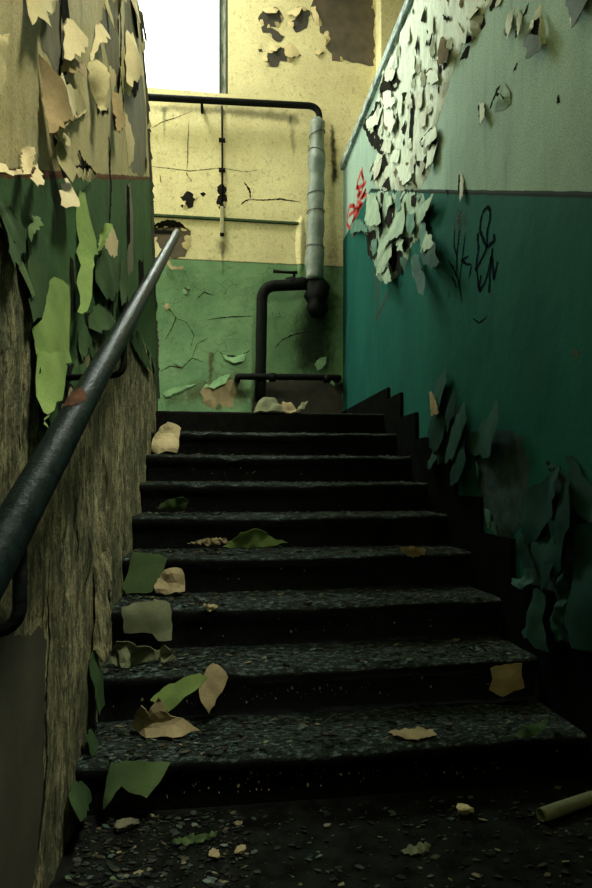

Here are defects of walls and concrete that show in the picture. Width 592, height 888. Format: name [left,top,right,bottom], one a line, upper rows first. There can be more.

spalling [180,191,206,210]
spalling [216,184,227,209]
crack [152,112,299,205]
peeling [258,0,502,297]
peeling [0,0,191,505]
crack [160,302,250,372]
peeling [0,286,592,888]